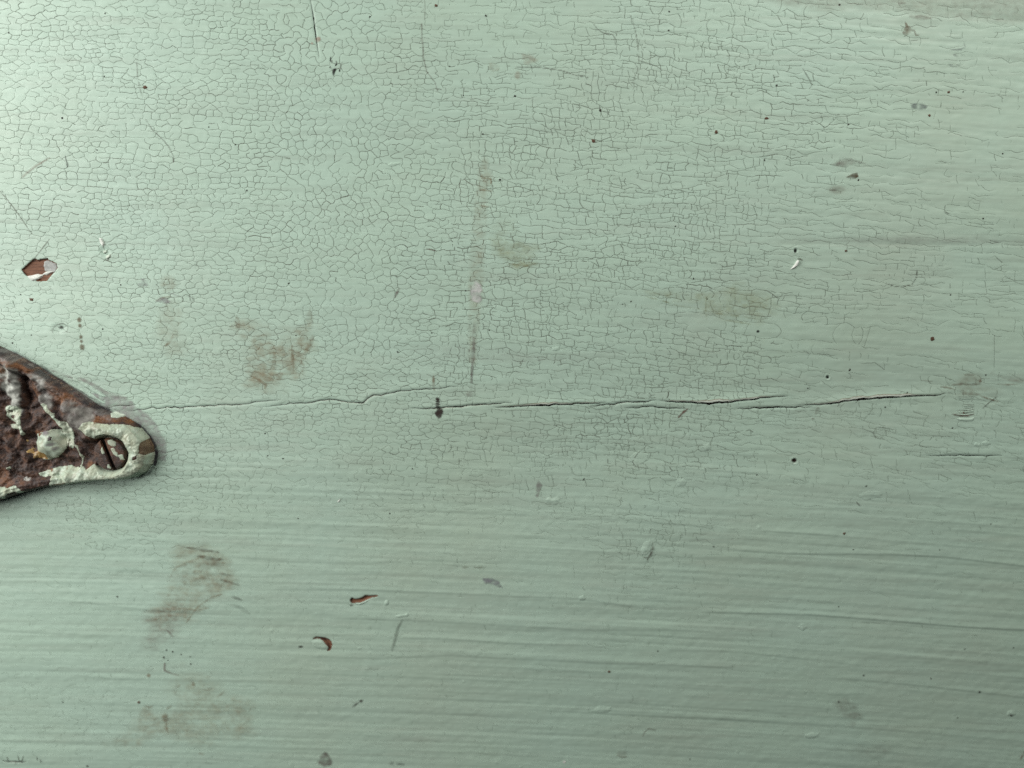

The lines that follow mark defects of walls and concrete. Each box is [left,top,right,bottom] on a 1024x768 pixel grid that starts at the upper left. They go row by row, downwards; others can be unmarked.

peeling [21,258,57,281]
crack [107,386,945,412]